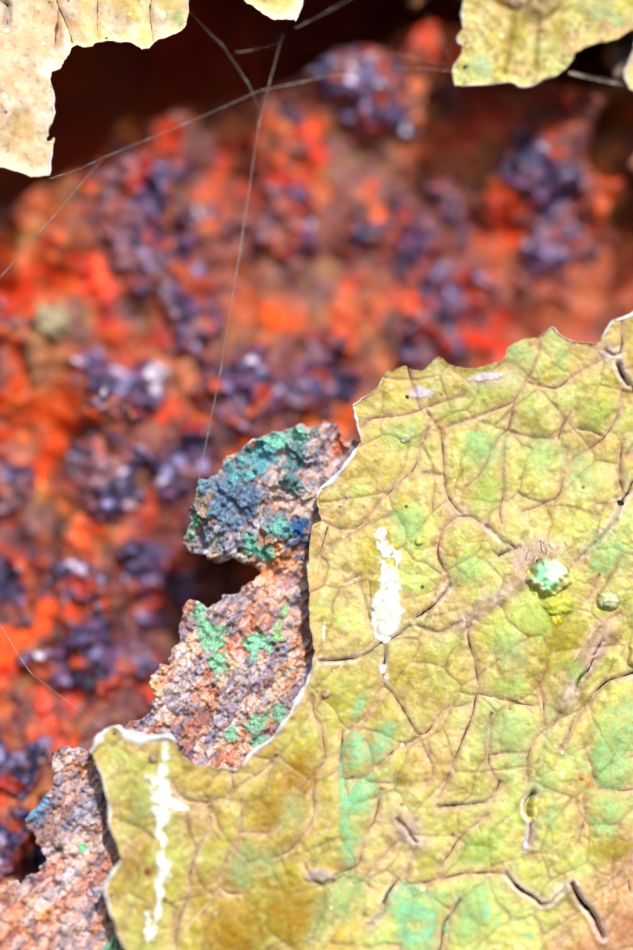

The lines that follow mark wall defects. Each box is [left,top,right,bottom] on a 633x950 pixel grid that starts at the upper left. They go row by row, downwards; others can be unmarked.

peeling [0,0,189,178]
rust [143,117,184,157]
peeling [244,0,303,21]
peeling [451,0,633,91]
rust [0,359,103,477]
rust [0,598,77,658]
peeling [89,312,633,950]
water stain [371,527,405,643]
crack [278,321,633,940]
water stain [143,742,189,941]
crack [174,760,275,943]
crack [439,900,460,950]